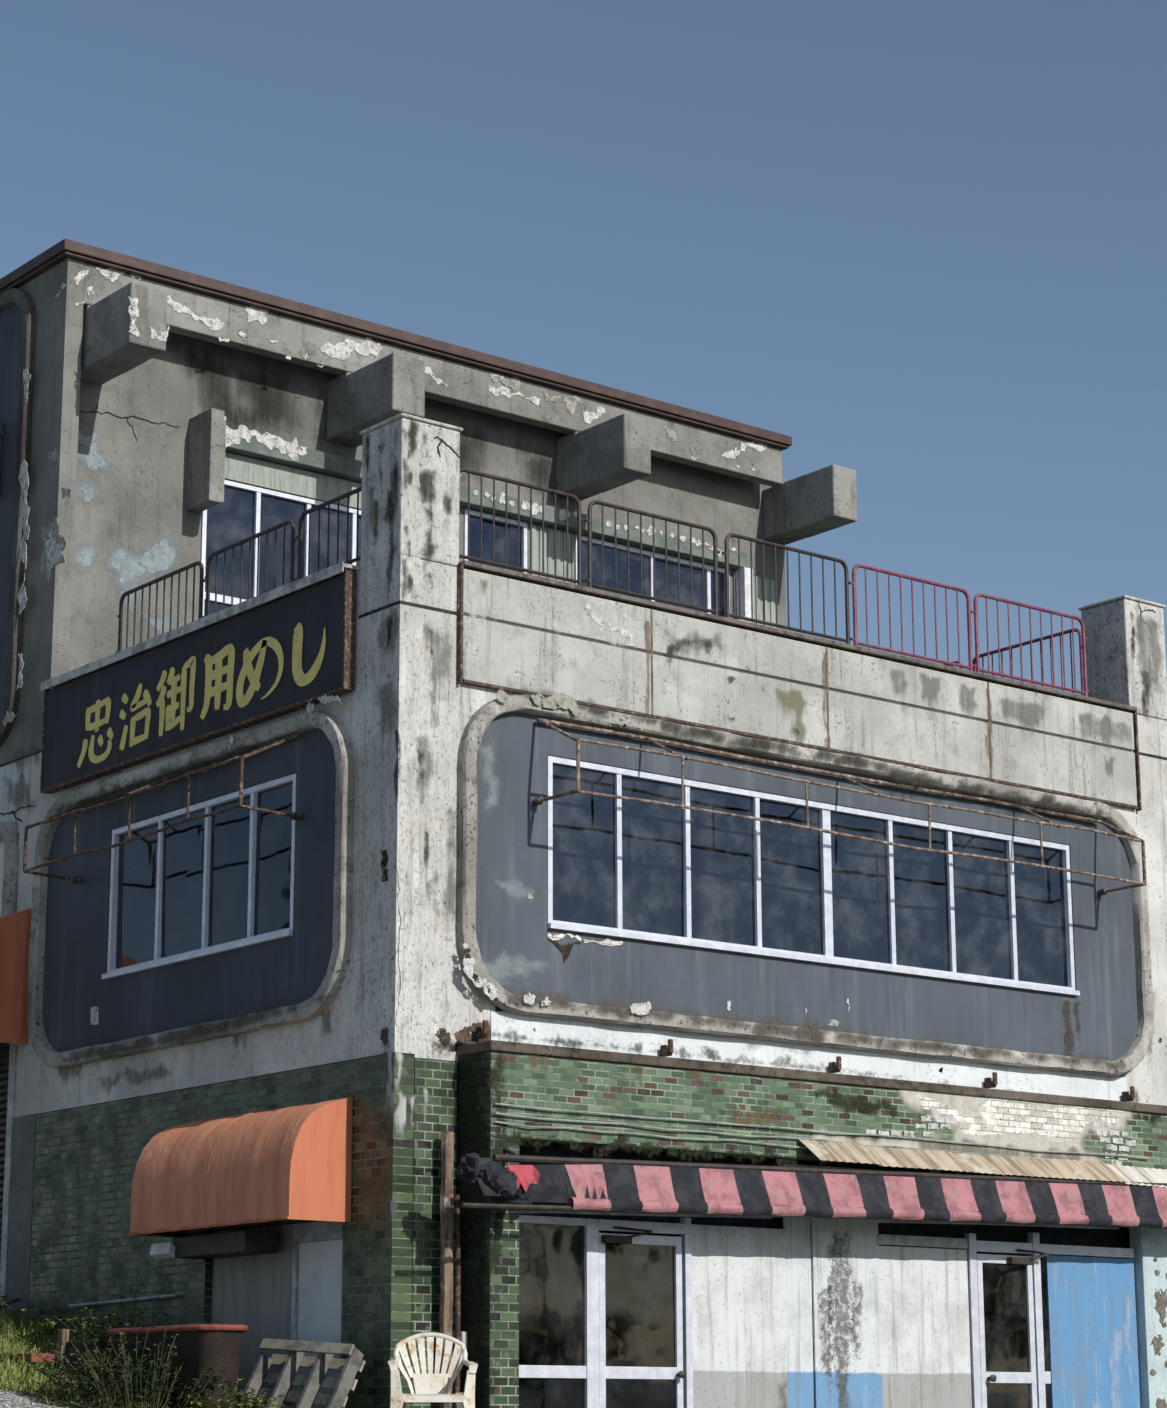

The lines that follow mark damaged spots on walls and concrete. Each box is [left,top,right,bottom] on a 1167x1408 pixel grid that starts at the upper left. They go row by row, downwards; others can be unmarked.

crack [79,404,179,439]
damp [187,351,287,425]
peeling [225,425,307,461]
damp [366,419,451,596]
peeling [18,460,177,633]
crack [0,804,38,823]
peeling [461,943,503,1000]
flaking render [547,933,623,962]
rust [1063,1001,1080,1056]
damp [387,1050,427,1128]
spalling [813,1082,1136,1165]
damp [818,1231,863,1408]